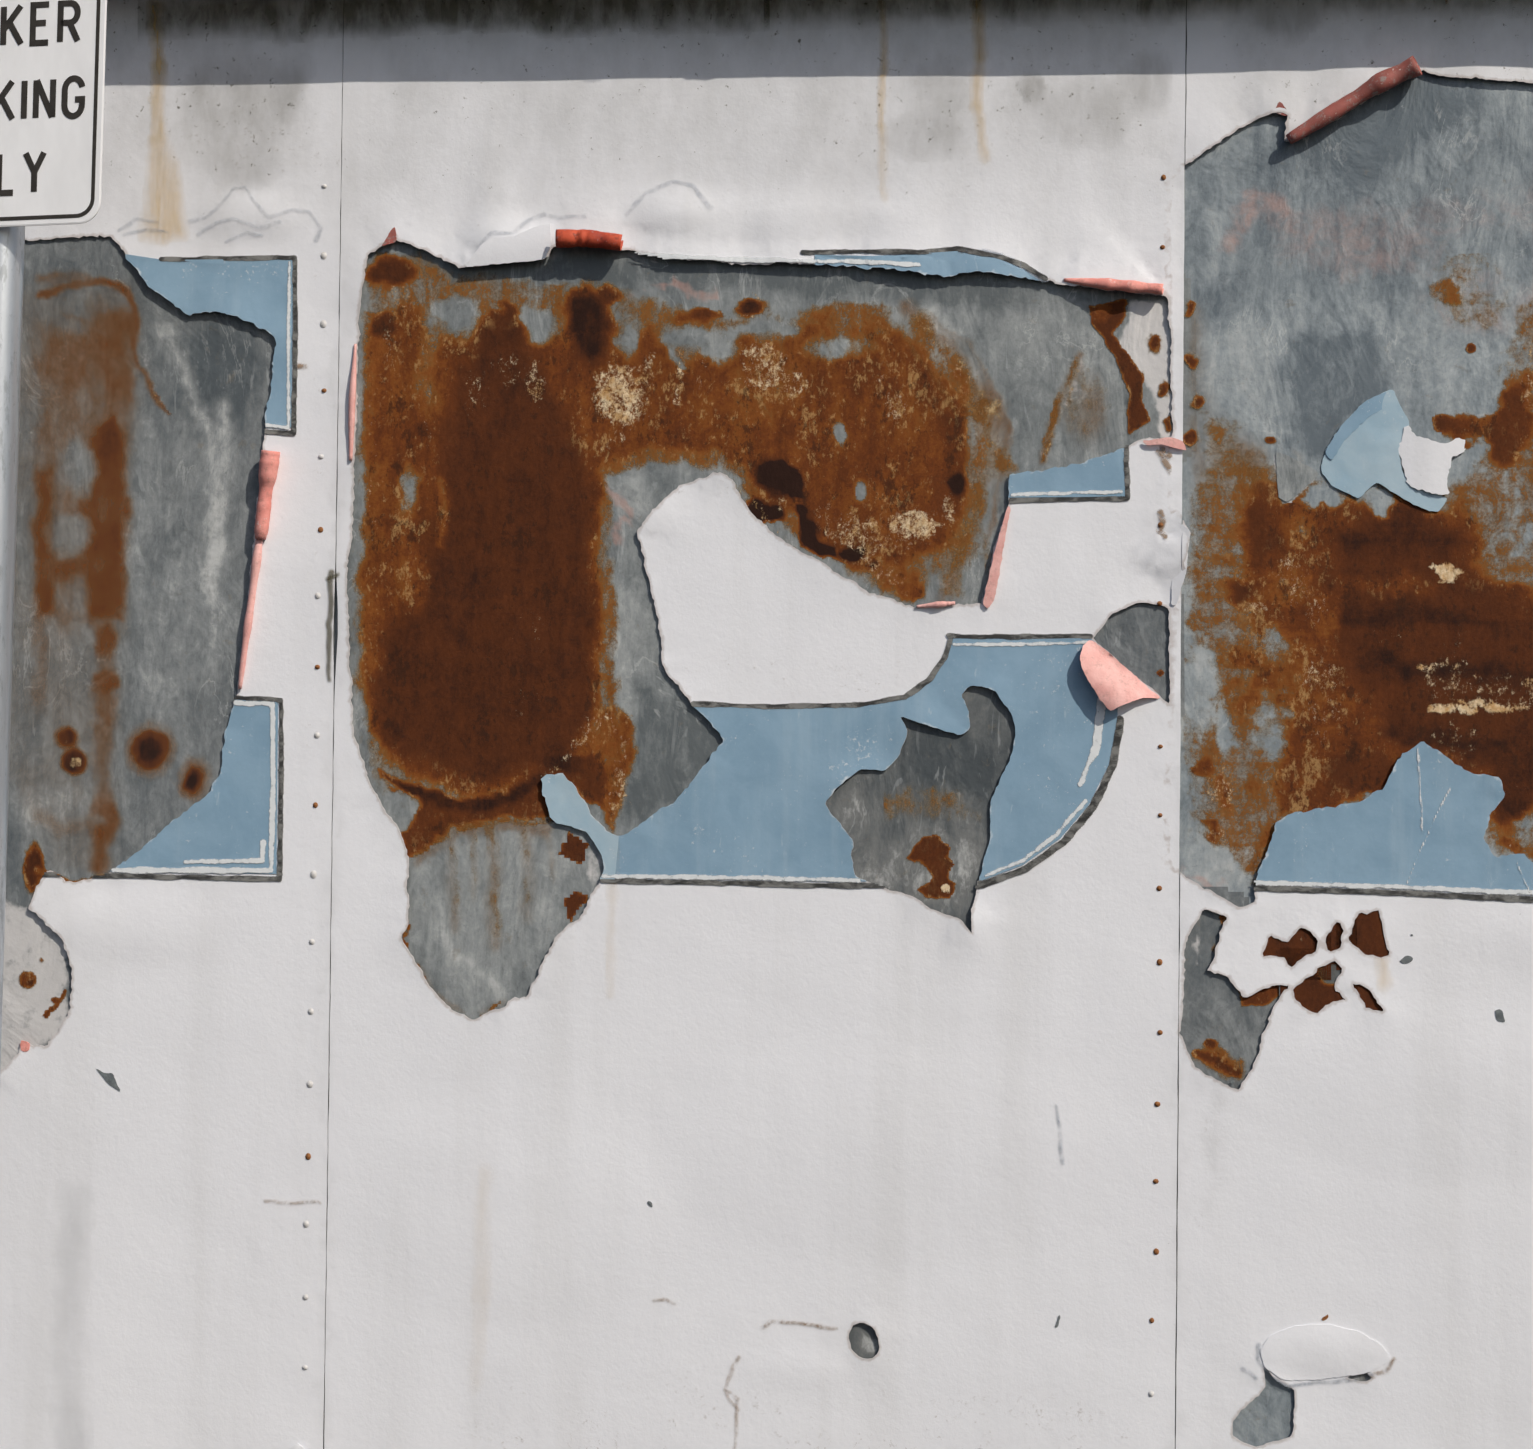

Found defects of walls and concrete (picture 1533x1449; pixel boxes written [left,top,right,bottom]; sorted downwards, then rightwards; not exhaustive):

corrosion [31,278,170,740]
corrosion [353,252,1017,858]
peeling [333,55,1533,1089]
corrosion [1089,255,1533,886]
peeling [0,236,280,1071]
corrosion [22,796,119,893]
corrosion [558,831,590,864]
corrosion [907,834,956,899]
corrosion [1238,985,1279,1007]
peeling [97,1069,120,1091]
peeling [1233,1368,1295,1447]
peeling [1348,1373,1371,1381]